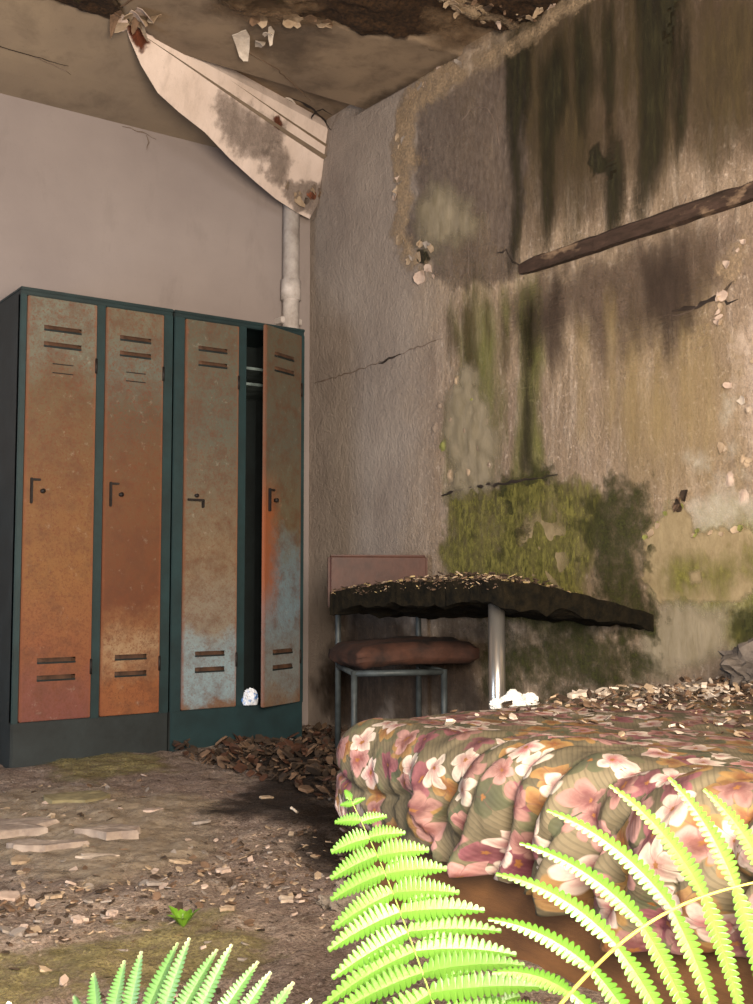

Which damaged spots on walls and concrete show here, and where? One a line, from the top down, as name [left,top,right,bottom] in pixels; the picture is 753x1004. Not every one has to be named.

peeling [57,0,163,53]
leakage [218,98,289,184]
peeling [213,0,591,287]
leakage [506,0,753,260]
crack [315,339,438,383]
leakage [505,227,719,360]
crack [659,279,738,317]
spalling [640,490,753,679]